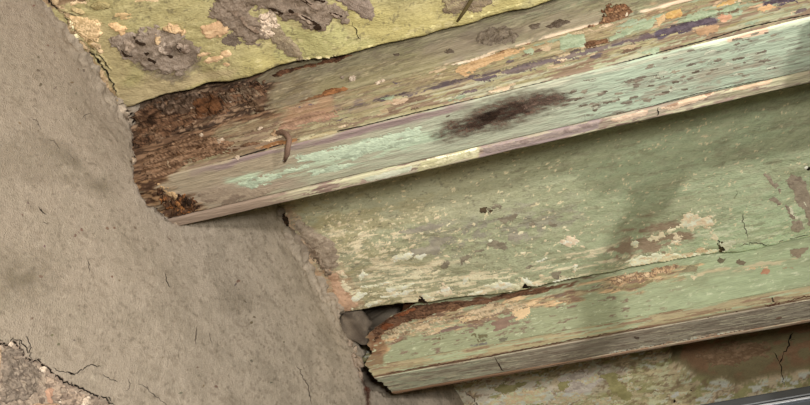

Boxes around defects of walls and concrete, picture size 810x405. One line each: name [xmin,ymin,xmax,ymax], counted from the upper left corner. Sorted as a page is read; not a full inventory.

peeling [52,0,133,122]
flaking render [197,50,232,67]
flaking render [200,20,230,39]
peeling [230,81,427,149]
leakage [431,93,565,141]
peeling [363,0,807,182]
peeling [196,126,422,205]
peeling [763,173,810,233]
peeling [610,208,738,291]
peeling [790,247,808,258]
crack [0,336,166,405]
crack [774,333,795,386]